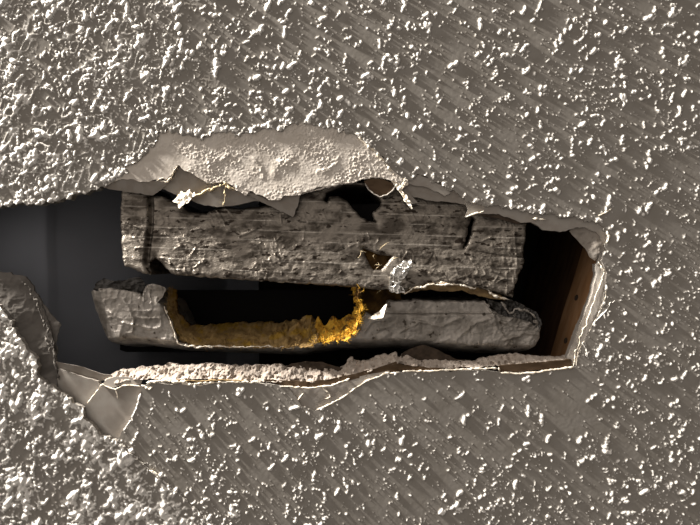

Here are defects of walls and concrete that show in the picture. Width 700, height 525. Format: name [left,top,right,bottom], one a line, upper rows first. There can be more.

peeling [55,122,614,439]